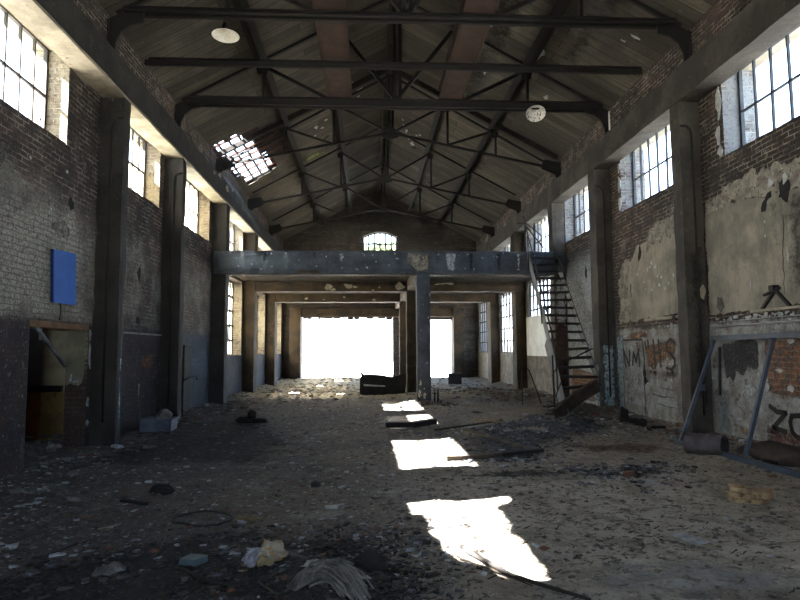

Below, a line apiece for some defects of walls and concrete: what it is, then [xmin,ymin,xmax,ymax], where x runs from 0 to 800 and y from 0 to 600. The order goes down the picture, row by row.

peeling [715,86,723,157]
spalling [705,157,800,223]
spalling [618,214,675,324]
peeling [715,297,795,323]
spalling [765,339,800,398]